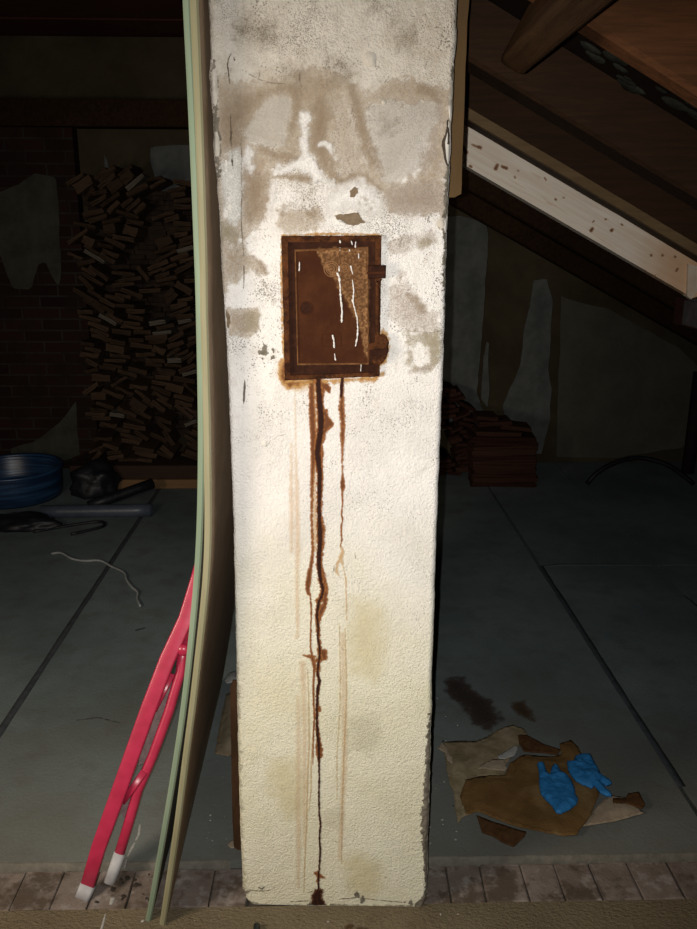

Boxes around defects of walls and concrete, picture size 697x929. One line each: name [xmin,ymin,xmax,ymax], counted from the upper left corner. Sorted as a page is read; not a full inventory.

water stain [210,67,451,292]
flaking render [334,210,365,226]
water stain [226,308,259,337]
water stain [391,288,441,371]
rust [278,233,389,905]